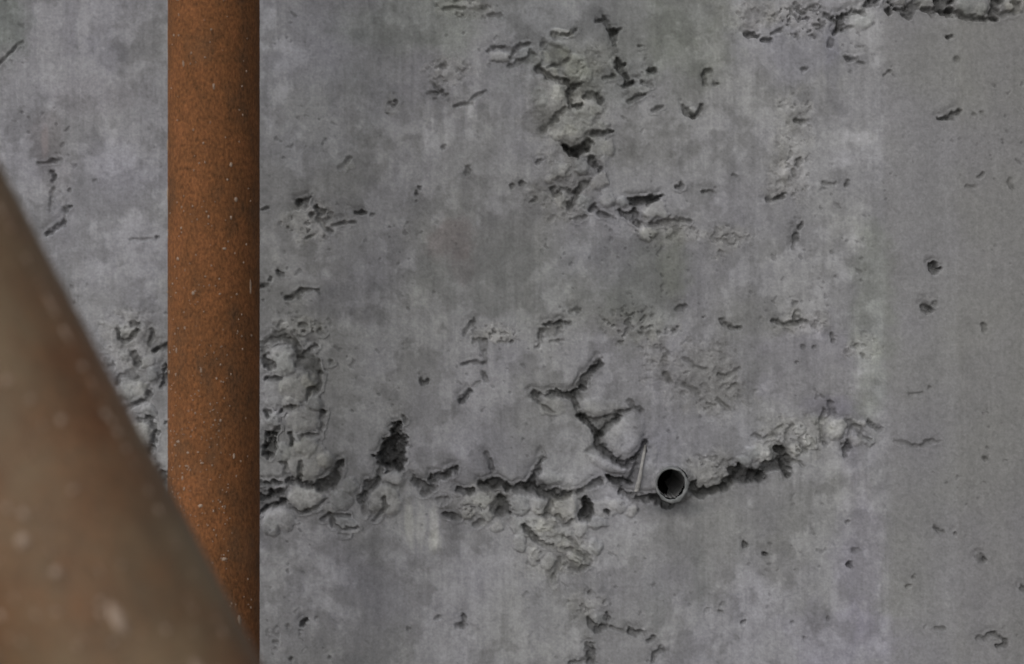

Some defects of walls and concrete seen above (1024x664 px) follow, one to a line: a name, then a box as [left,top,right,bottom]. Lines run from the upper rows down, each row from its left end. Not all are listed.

hole [716,0,839,48]
spalling [564,27,638,128]
spalling [507,113,615,239]
hole [95,301,166,383]
crack [659,353,787,444]
spalling [681,444,735,483]